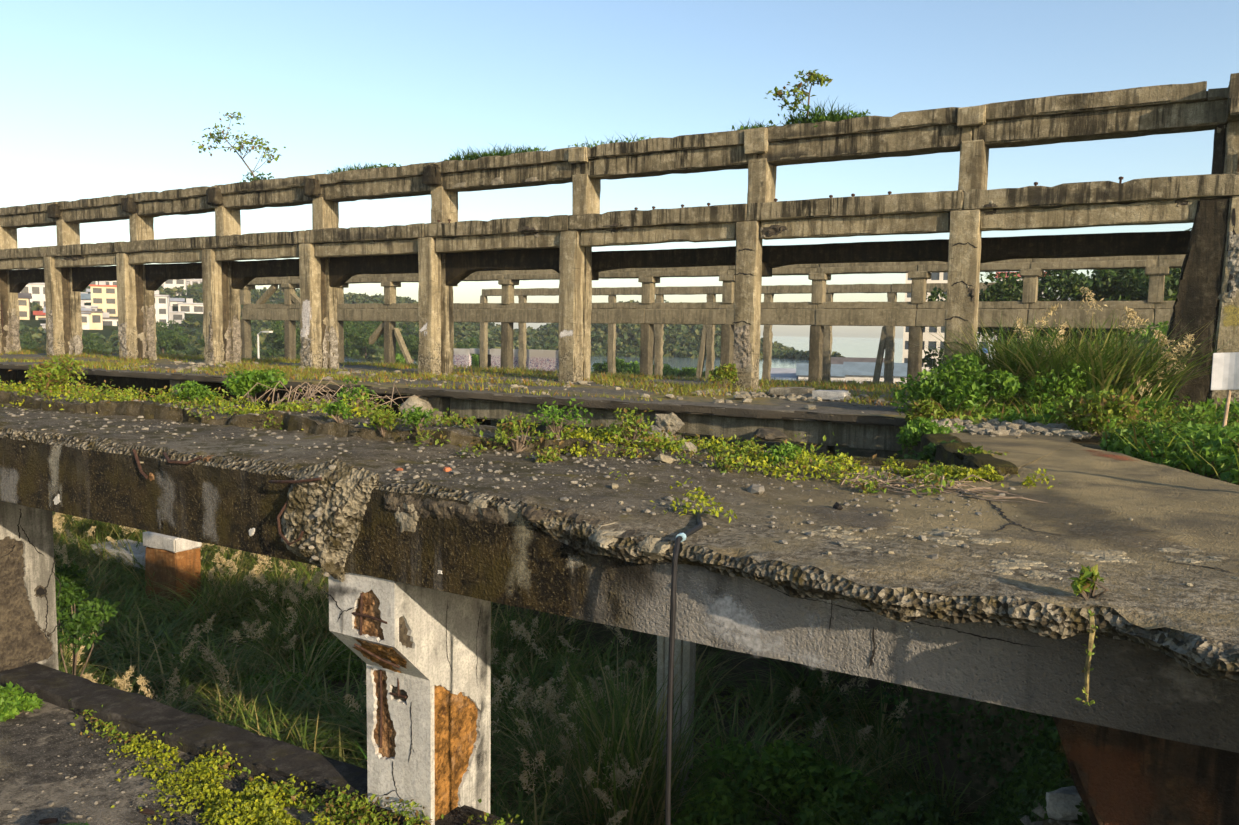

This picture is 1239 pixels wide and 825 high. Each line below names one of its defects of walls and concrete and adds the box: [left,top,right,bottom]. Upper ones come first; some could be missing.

spalling [1218,232,1239,303]
crack [989,501,1065,536]
spalling [0,536,53,671]
crack [769,586,875,669]
crack [912,621,1040,647]